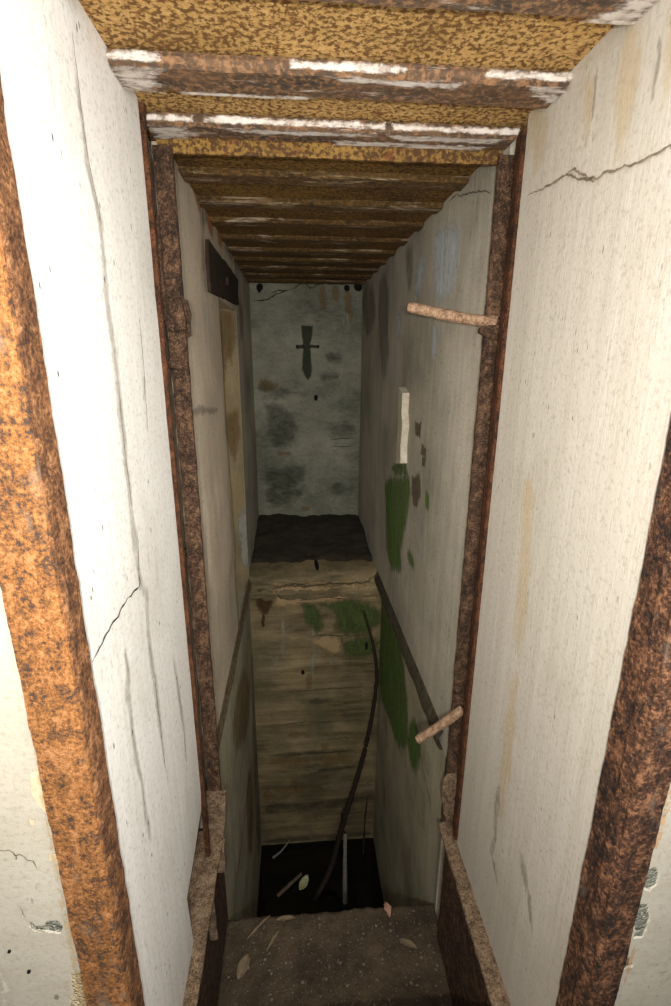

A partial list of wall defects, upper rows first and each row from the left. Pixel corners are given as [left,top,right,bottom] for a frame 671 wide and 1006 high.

crack [528,144,671,195]
crack [450,190,491,201]
crack [92,535,140,662]
spalling [644,867,658,889]
spalling [634,904,649,937]